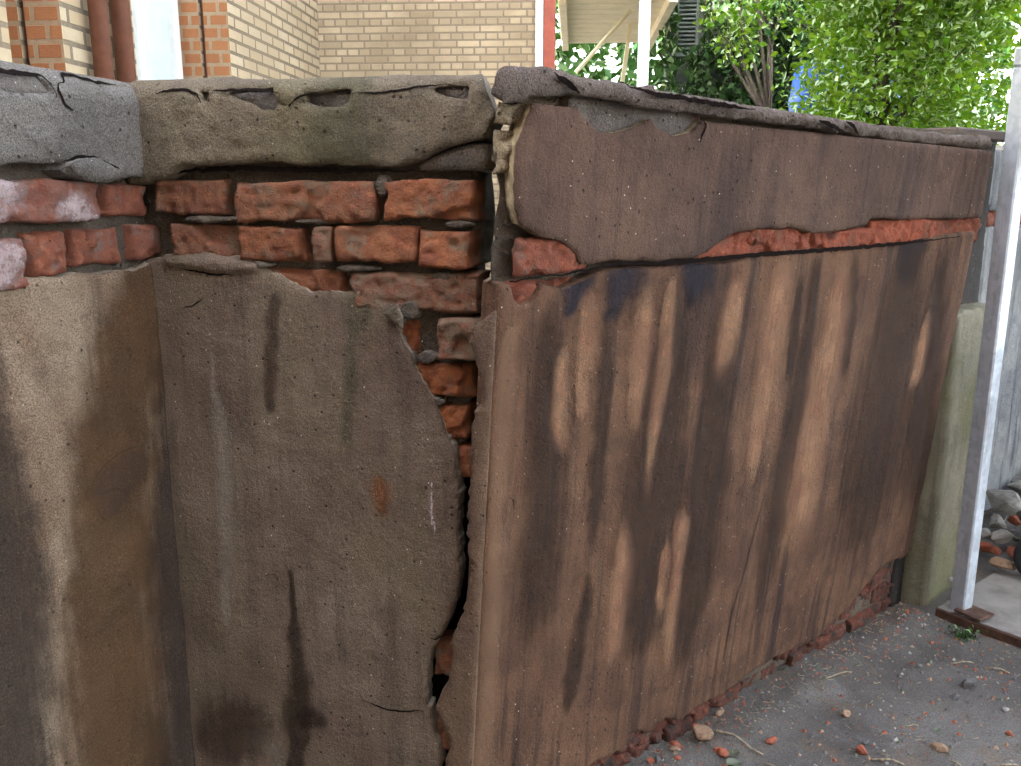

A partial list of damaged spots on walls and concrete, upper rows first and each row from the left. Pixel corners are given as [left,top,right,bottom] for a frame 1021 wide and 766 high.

crack [0,68,115,110]
water stain [0,179,24,223]
water stain [0,240,24,291]
water stain [59,193,98,222]
flaking render [505,236,587,304]
flaking render [680,211,996,260]
flaking render [0,158,491,477]
water stain [265,294,279,411]
water stain [0,424,54,766]
crack [363,477,471,712]
water stain [285,570,326,766]
flaking render [434,629,456,676]